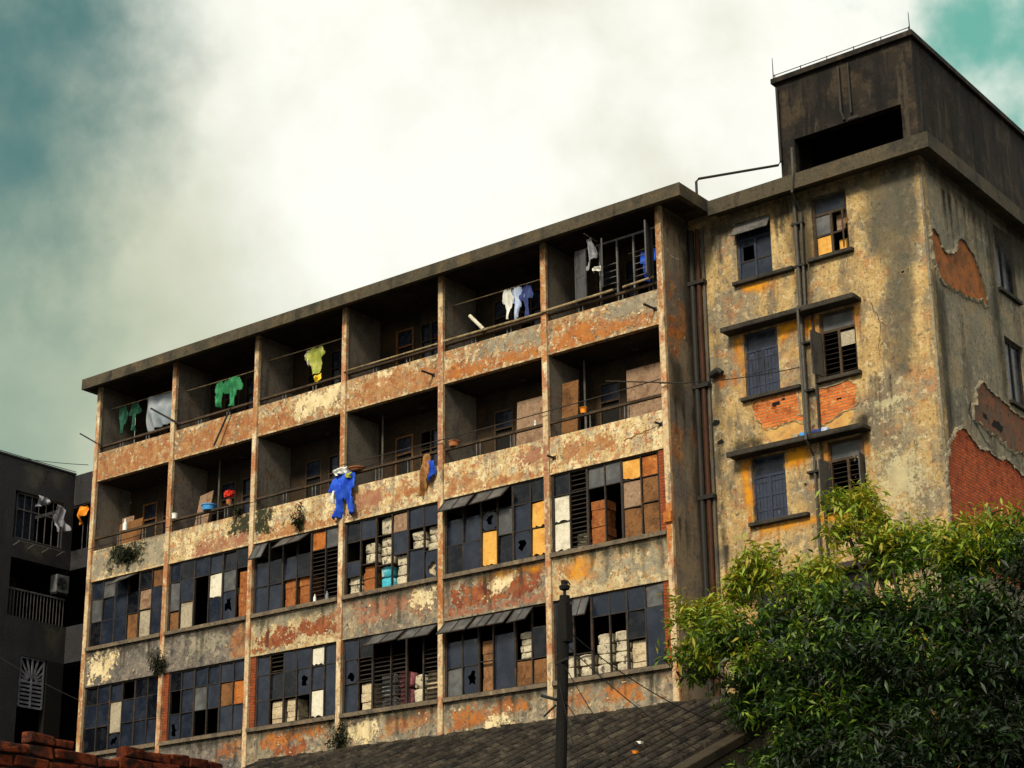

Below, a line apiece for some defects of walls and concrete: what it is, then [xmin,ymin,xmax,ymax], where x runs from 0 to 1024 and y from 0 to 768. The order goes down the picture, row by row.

spalling [928,225,990,309]
spalling [751,378,860,442]
spalling [944,380,1024,532]